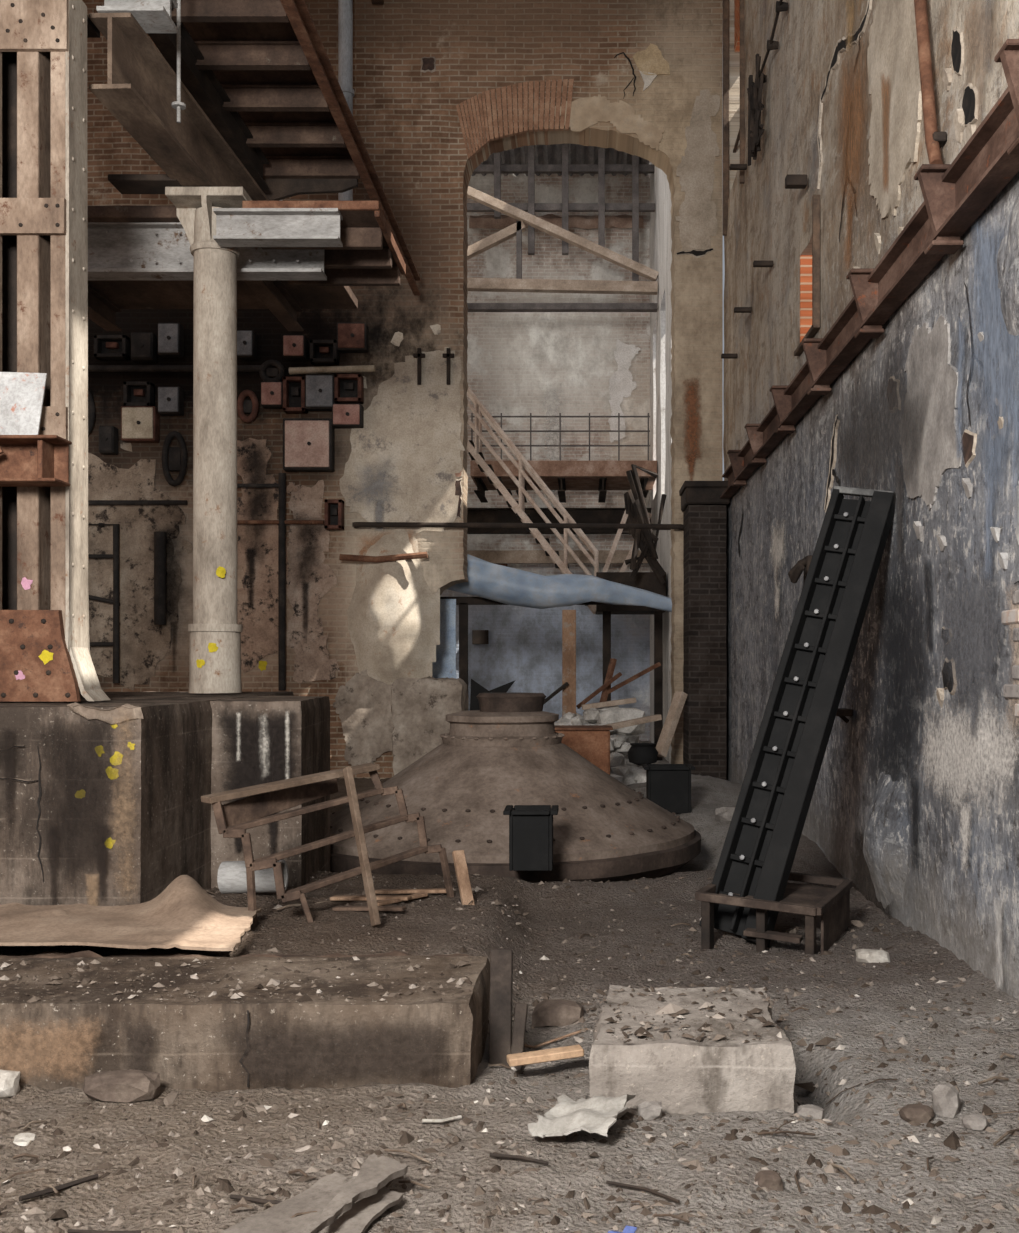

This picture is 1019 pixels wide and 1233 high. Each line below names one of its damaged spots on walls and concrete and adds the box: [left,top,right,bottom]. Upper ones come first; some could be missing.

crack [817,0,872,242]
peeling [990,481,1019,569]
flaking render [1001,590,1019,755]